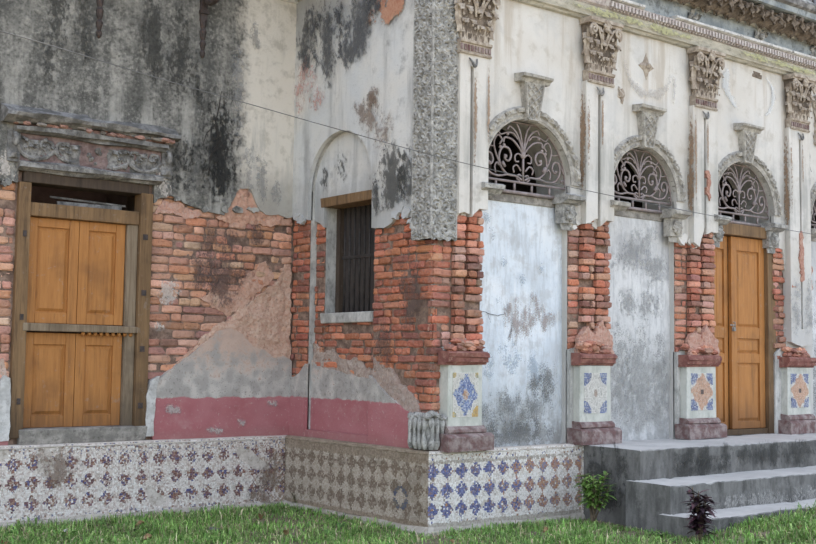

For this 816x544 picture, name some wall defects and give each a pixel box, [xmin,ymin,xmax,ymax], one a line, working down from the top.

water stain [0,151,10,175]
water stain [41,0,92,85]
water stain [141,0,241,203]
water stain [296,0,380,110]
flaking render [368,0,404,24]
corrosion [687,121,697,211]
flaking render [0,178,15,378]
flaking render [148,189,486,413]
flaking render [567,218,615,354]
flaking render [673,233,720,356]
flaking render [773,231,813,359]
water stain [483,365,555,447]